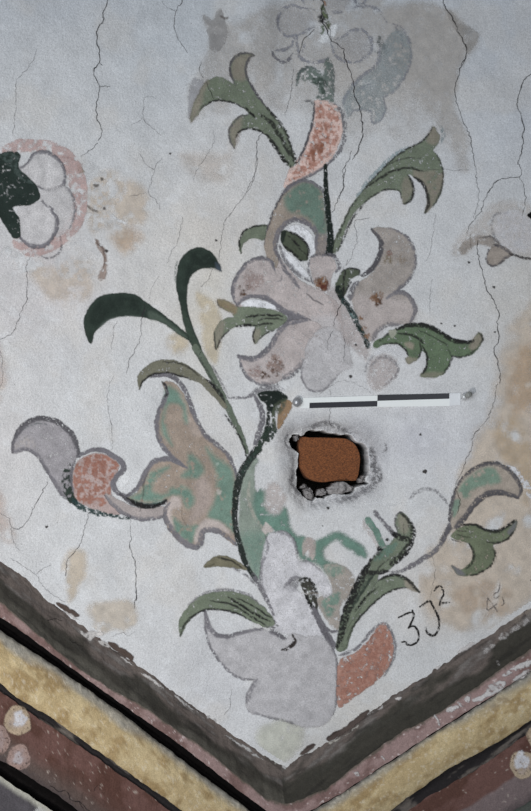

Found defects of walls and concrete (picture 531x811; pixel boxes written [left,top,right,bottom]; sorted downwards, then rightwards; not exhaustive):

crack [84,0,110,155]
crack [300,0,363,212]
crack [443,0,531,413]
water stain [420,312,531,630]